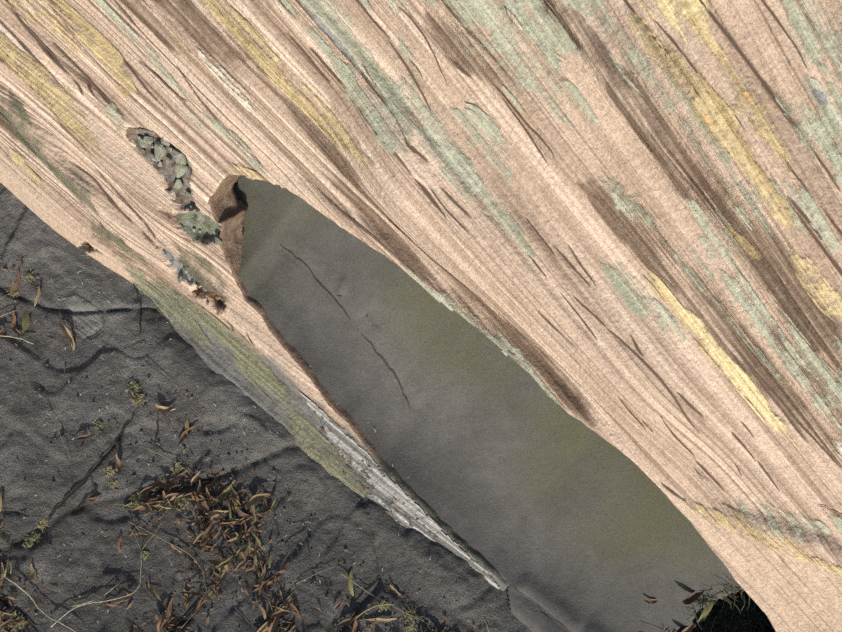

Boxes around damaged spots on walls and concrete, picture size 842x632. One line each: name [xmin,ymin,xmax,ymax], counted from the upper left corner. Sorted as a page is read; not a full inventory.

crack [47,410,139,523]